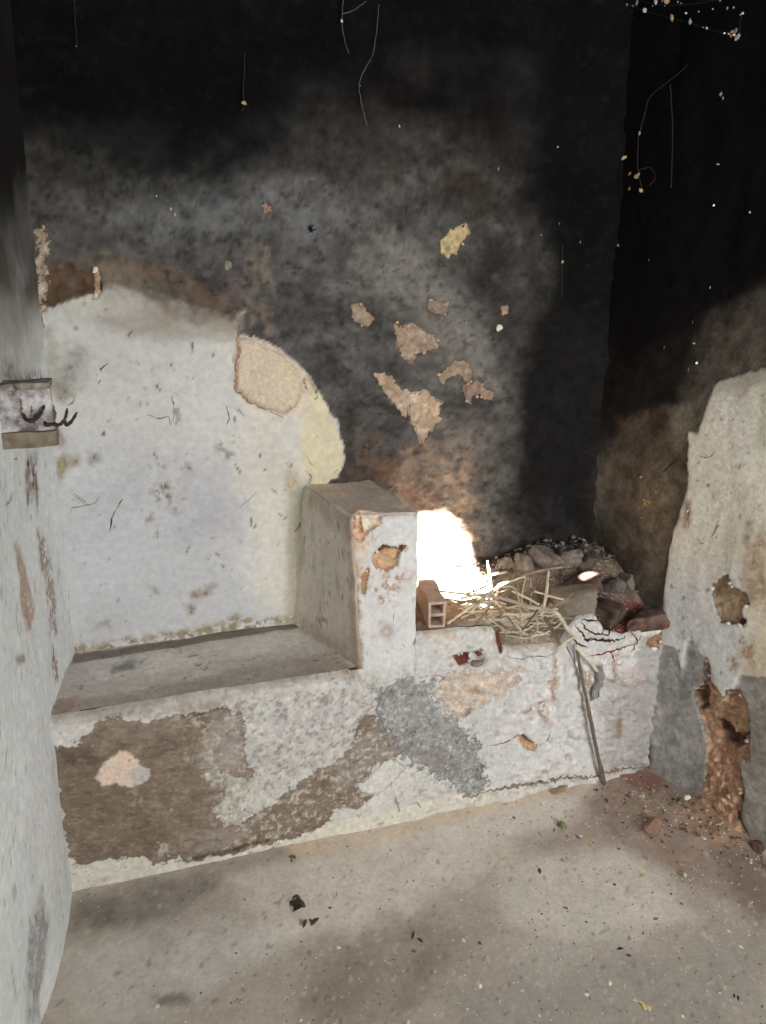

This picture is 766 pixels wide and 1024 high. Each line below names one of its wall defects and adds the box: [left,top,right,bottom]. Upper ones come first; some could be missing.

spalling [440,223,471,259]
spalling [33,225,51,313]
spalling [349,303,374,327]
spalling [234,316,318,419]
spalling [374,372,443,444]
spalling [394,321,439,368]
spalling [436,360,495,405]
spalling [361,544,407,595]
spalling [712,574,749,627]
flaking render [95,750,151,788]
flaking render [356,649,521,797]
spalling [694,659,751,837]